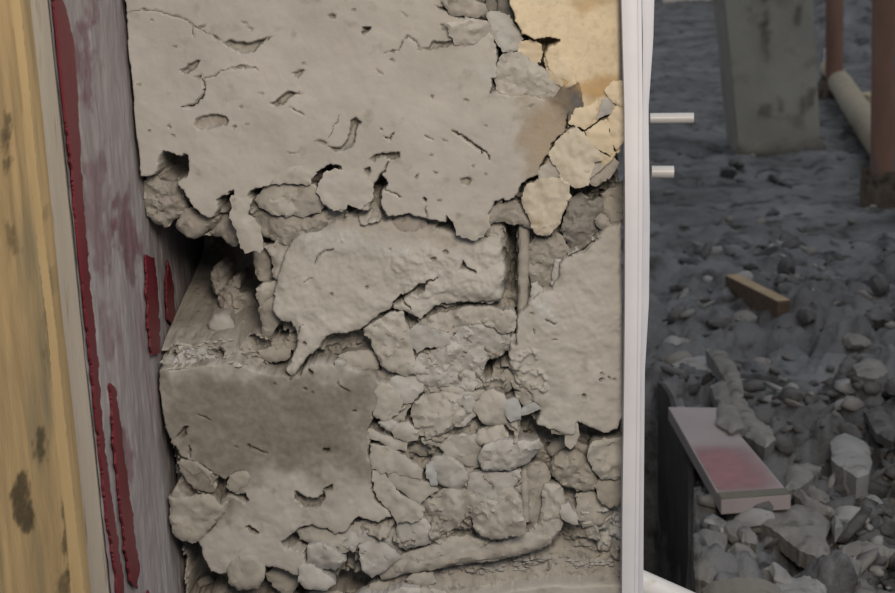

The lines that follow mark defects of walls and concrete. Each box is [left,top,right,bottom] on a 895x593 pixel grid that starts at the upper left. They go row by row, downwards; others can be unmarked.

crack [131,10,206,40]
crack [181,69,228,107]
spalling [193,113,230,131]
spalling [313,116,364,152]
crack [426,130,490,159]
spalling [417,0,576,109]
spalling [446,80,624,310]
leakage [509,0,620,135]
spalling [143,151,451,422]
spalling [168,420,622,593]